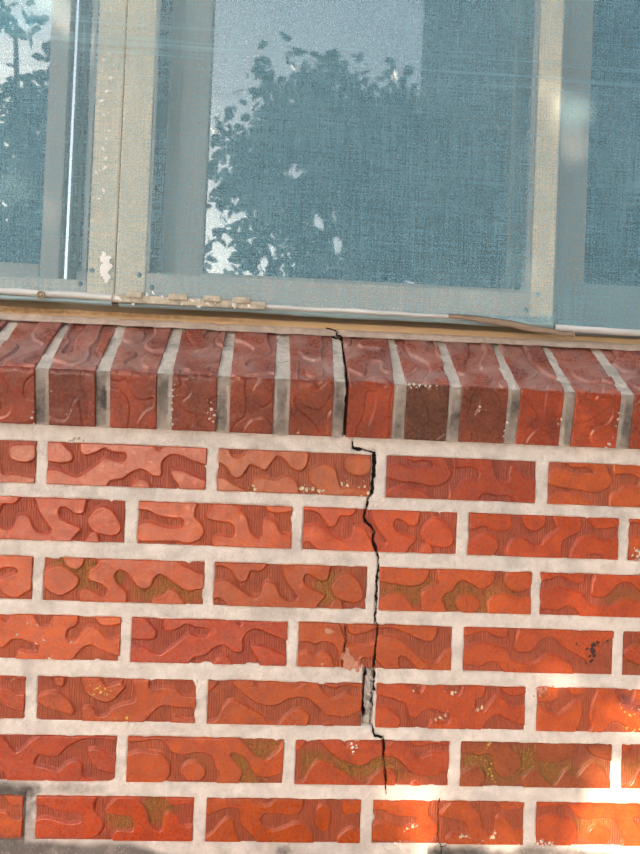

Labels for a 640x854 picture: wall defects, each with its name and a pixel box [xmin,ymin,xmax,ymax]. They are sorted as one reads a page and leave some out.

crack [326,328,387,793]